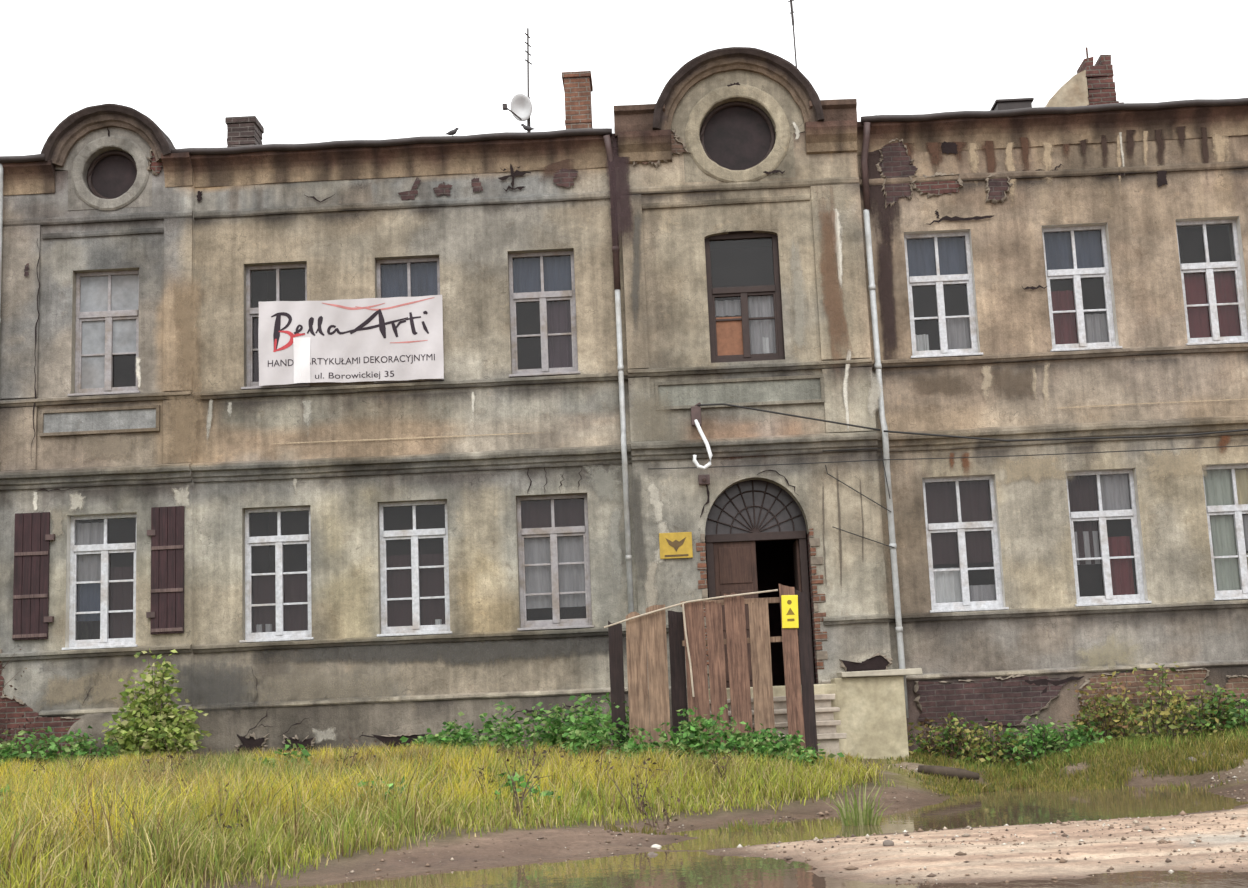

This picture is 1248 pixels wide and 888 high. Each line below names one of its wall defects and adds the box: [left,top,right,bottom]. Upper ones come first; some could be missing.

spalling [398,177,453,200]
spalling [876,138,963,209]
damp [969,143,979,173]
spalling [985,174,1013,203]
damp [1005,142,1016,196]
damp [1043,142,1052,178]
damp [1080,126,1185,179]
damp [1201,127,1229,164]
spalling [0,649,81,761]
spalling [913,667,1210,731]
spalling [234,732,316,754]
spalling [371,731,431,751]